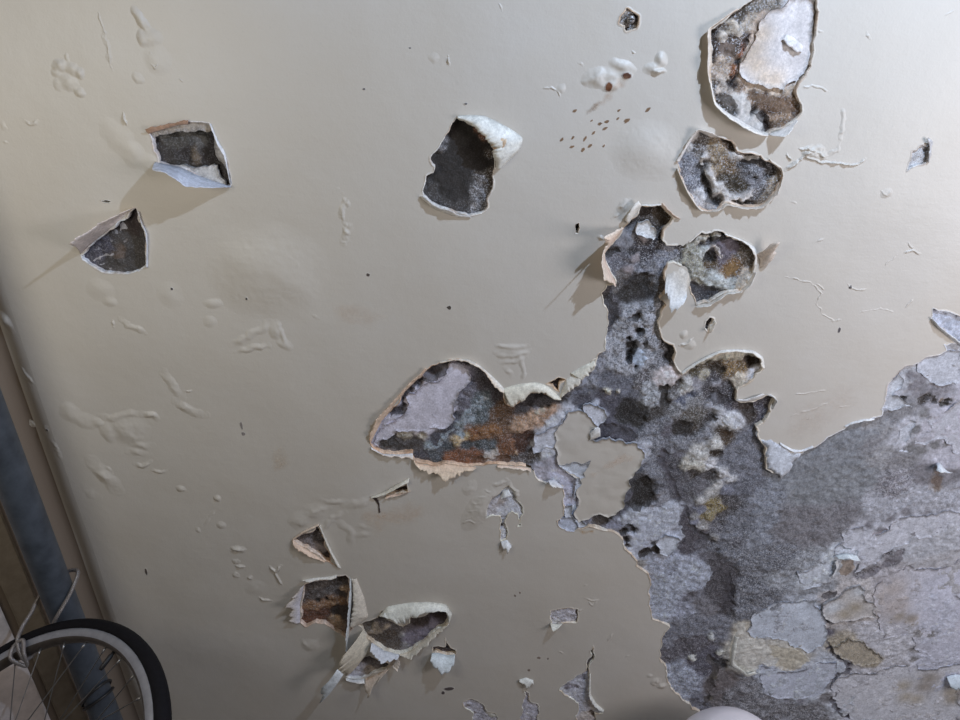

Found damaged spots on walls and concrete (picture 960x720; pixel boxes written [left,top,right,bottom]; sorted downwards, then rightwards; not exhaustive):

spalling [707,0,820,137]
spalling [145,119,232,188]
spalling [419,115,523,218]
spalling [676,129,784,212]
peeling [905,137,934,173]
spalling [69,207,149,275]
spalling [589,205,780,375]
flaking render [368,308,960,720]
spalling [285,524,457,703]